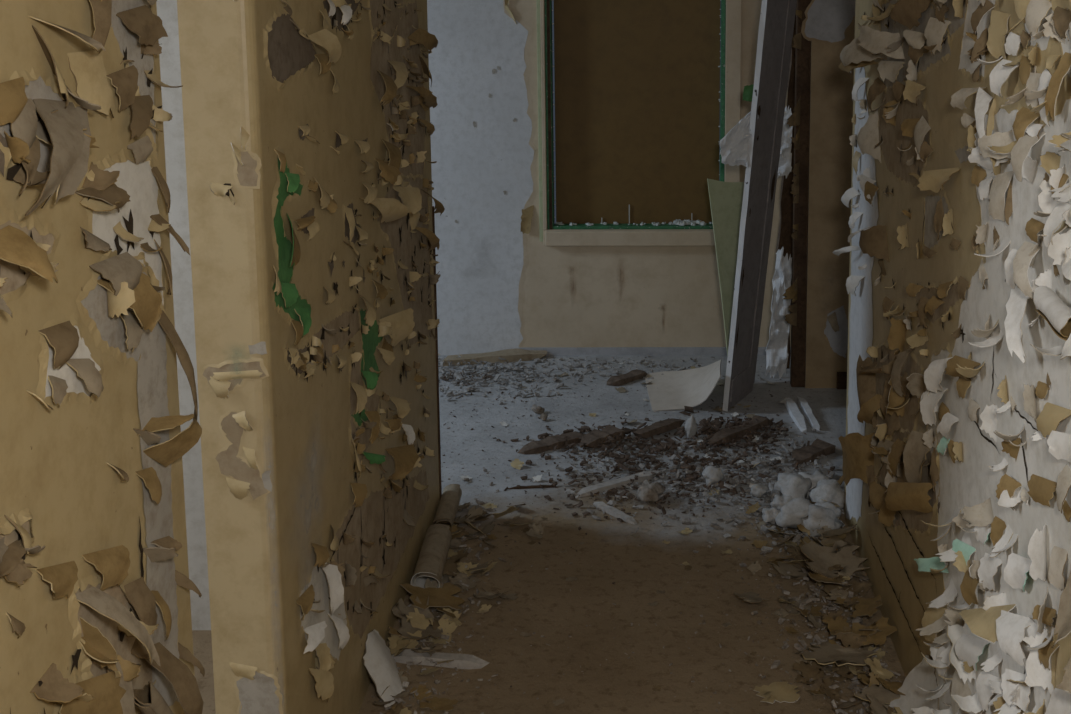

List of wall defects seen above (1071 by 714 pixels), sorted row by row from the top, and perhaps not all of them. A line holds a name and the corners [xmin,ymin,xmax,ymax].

peeling [0,0,272,714]
spalling [229,662,283,714]
peeling [263,0,538,702]
peeling [782,279,797,326]
peeling [787,98,800,203]
peeling [791,0,1071,714]